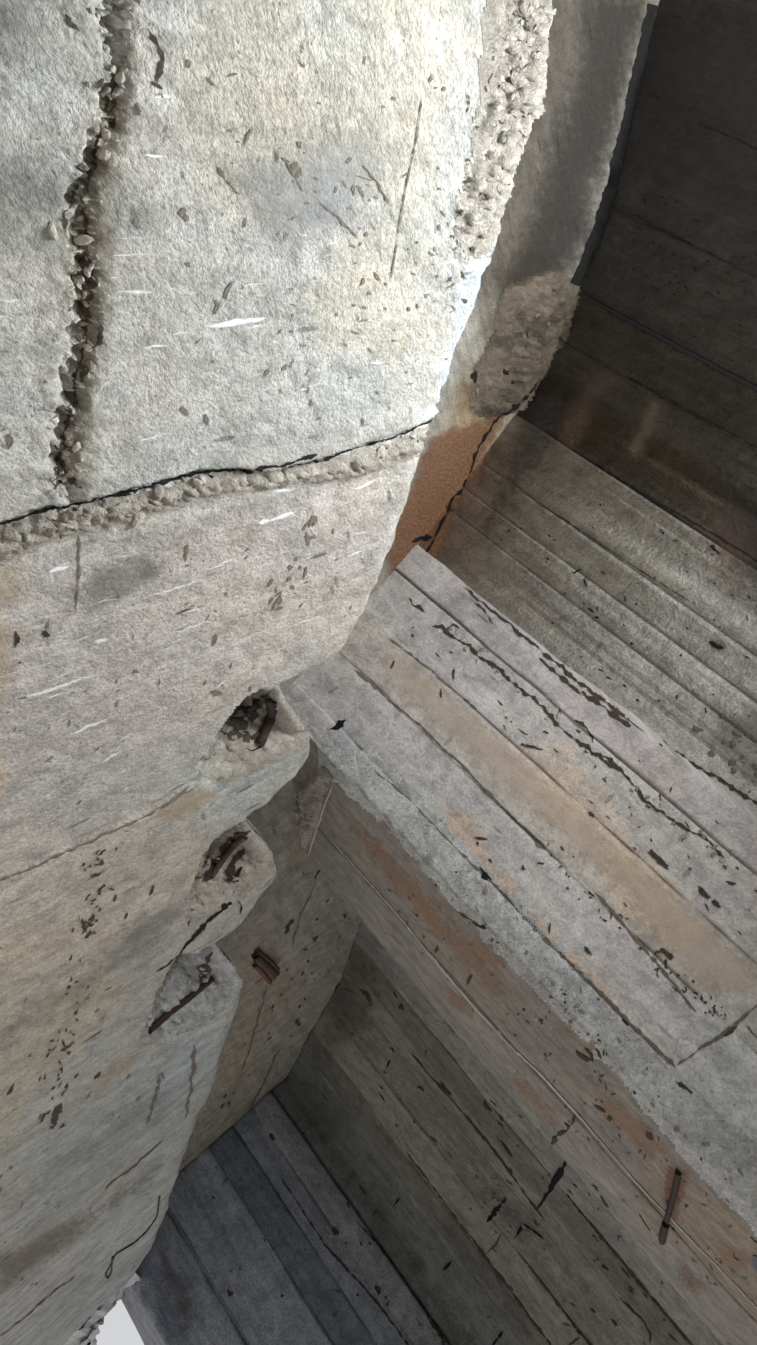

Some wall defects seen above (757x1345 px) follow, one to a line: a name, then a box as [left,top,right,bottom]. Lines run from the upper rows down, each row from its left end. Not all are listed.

crack [0,0,432,539]
spalling [0,427,429,562]
corrosion [386,417,502,572]
spalling [267,515,318,610]
crack [409,587,757,869]
spalling [185,826,275,922]
spalling [140,944,242,1047]
corrosion [251,948,280,985]
spalling [199,685,757,1245]
crack [487,1114,576,1253]
spalling [64,1270,141,1345]